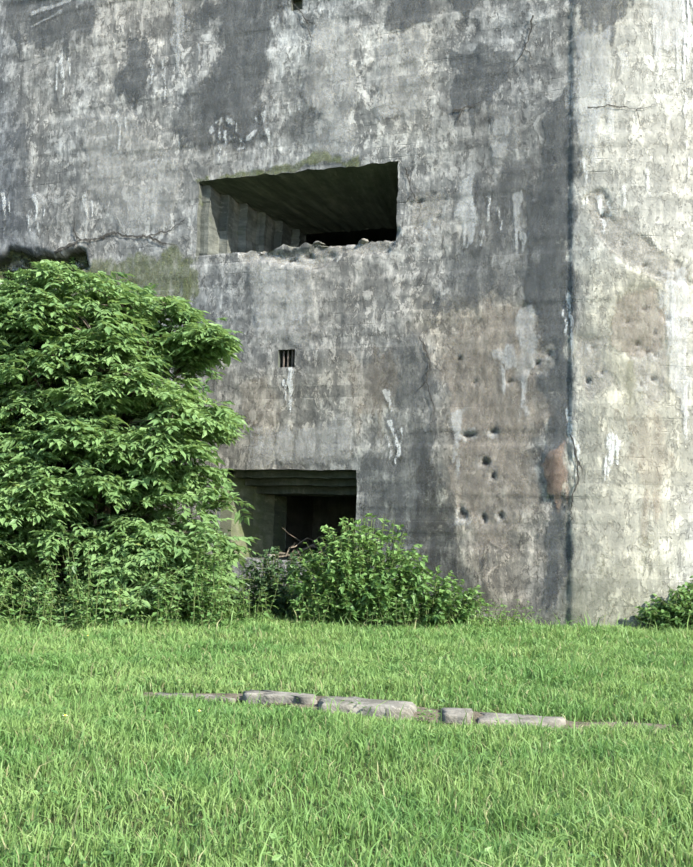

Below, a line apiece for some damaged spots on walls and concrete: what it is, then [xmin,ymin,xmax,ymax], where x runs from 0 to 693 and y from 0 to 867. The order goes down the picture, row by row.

water stain [572,0,634,60]
water stain [682,0,693,80]
spalling [0,250,89,284]
crack [54,219,185,255]
water stain [524,82,609,612]
water stain [282,367,293,410]
corrosion [543,443,569,508]
crack [568,435,583,526]
water stain [604,433,621,479]